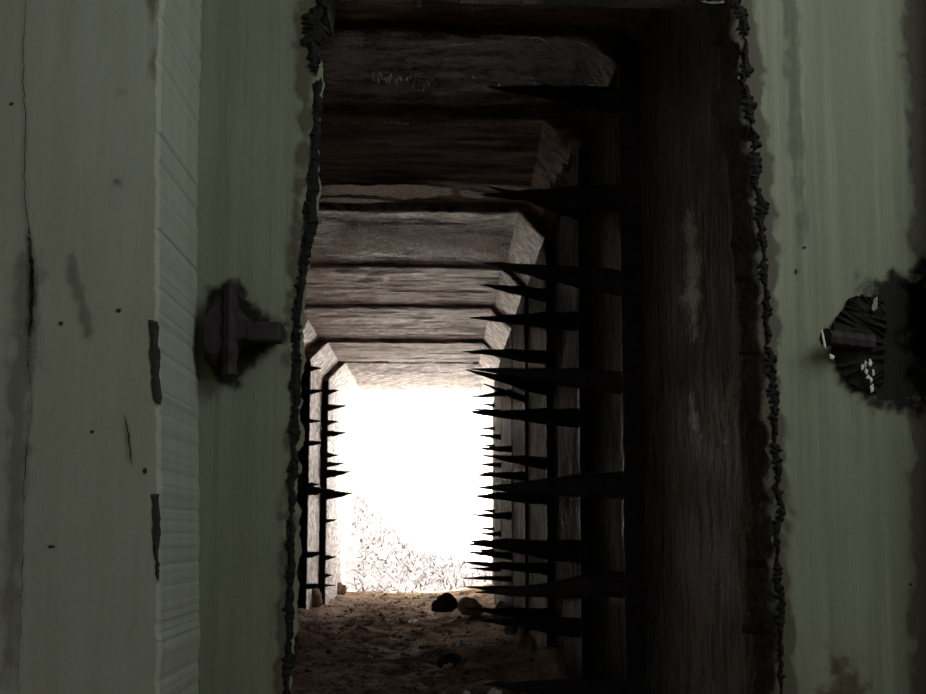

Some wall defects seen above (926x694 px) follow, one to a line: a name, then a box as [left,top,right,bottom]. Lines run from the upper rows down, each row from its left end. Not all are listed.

crack [17,1,34,691]
peeling [861,359,875,393]